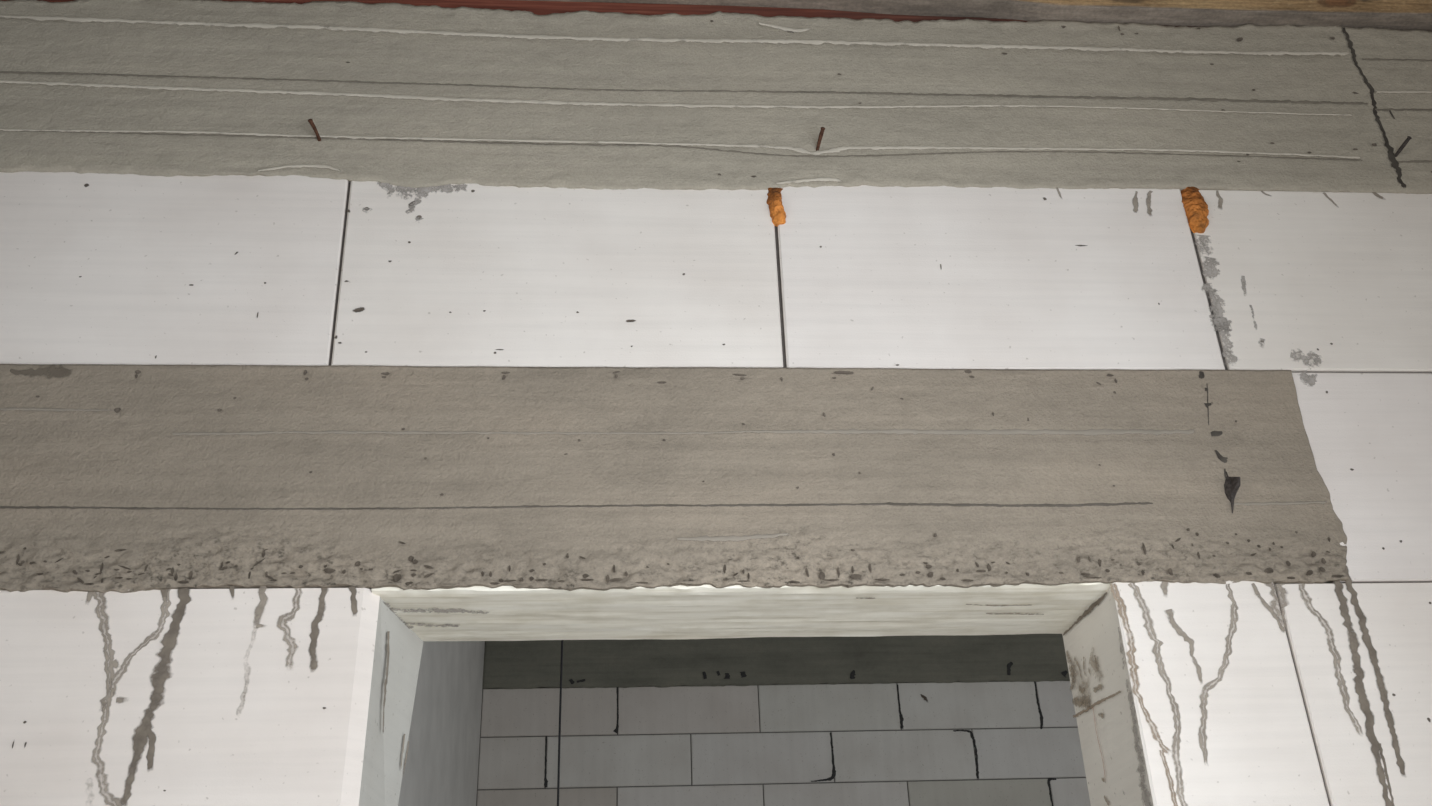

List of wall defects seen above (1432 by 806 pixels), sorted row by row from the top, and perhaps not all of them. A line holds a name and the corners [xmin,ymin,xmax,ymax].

crack [1343,27,1406,187]
crack [1199,371,1227,480]
water stain [87,588,191,806]
water stain [254,586,328,670]
water stain [348,586,358,615]
water stain [1110,581,1238,806]
water stain [1252,566,1405,806]